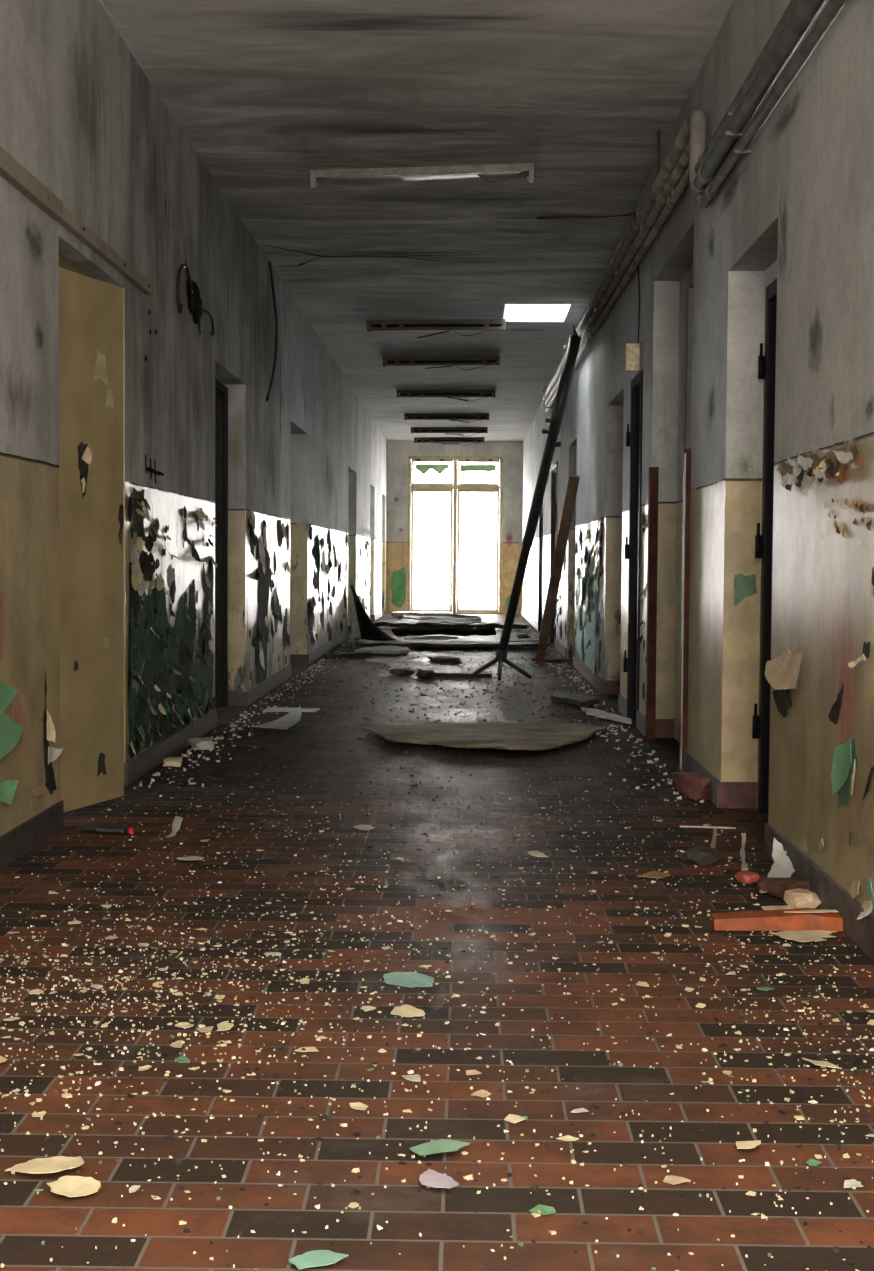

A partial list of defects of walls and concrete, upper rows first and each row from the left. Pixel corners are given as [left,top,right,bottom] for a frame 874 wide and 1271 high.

peeling [776,440,863,496]
peeling [118,487,217,759]
peeling [248,509,290,684]
peeling [307,524,371,645]
peeling [554,517,604,676]
peeling [0,680,23,760]
peeling [0,780,19,804]